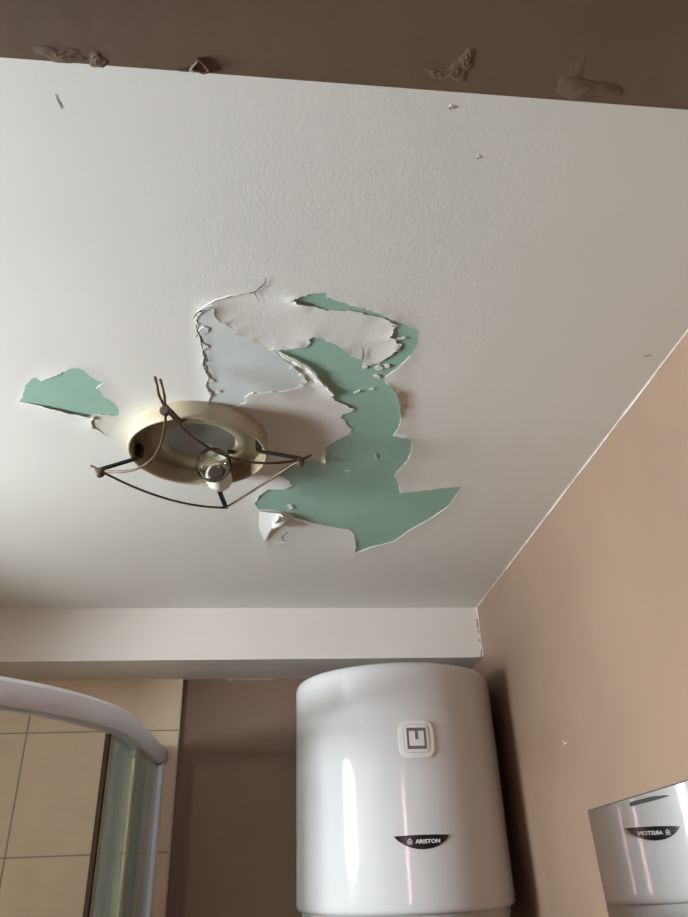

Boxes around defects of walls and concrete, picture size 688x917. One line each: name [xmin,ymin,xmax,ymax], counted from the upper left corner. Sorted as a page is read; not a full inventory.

flaking render [177,58,210,75]
peeling [13,359,129,443]
peeling [187,281,472,564]